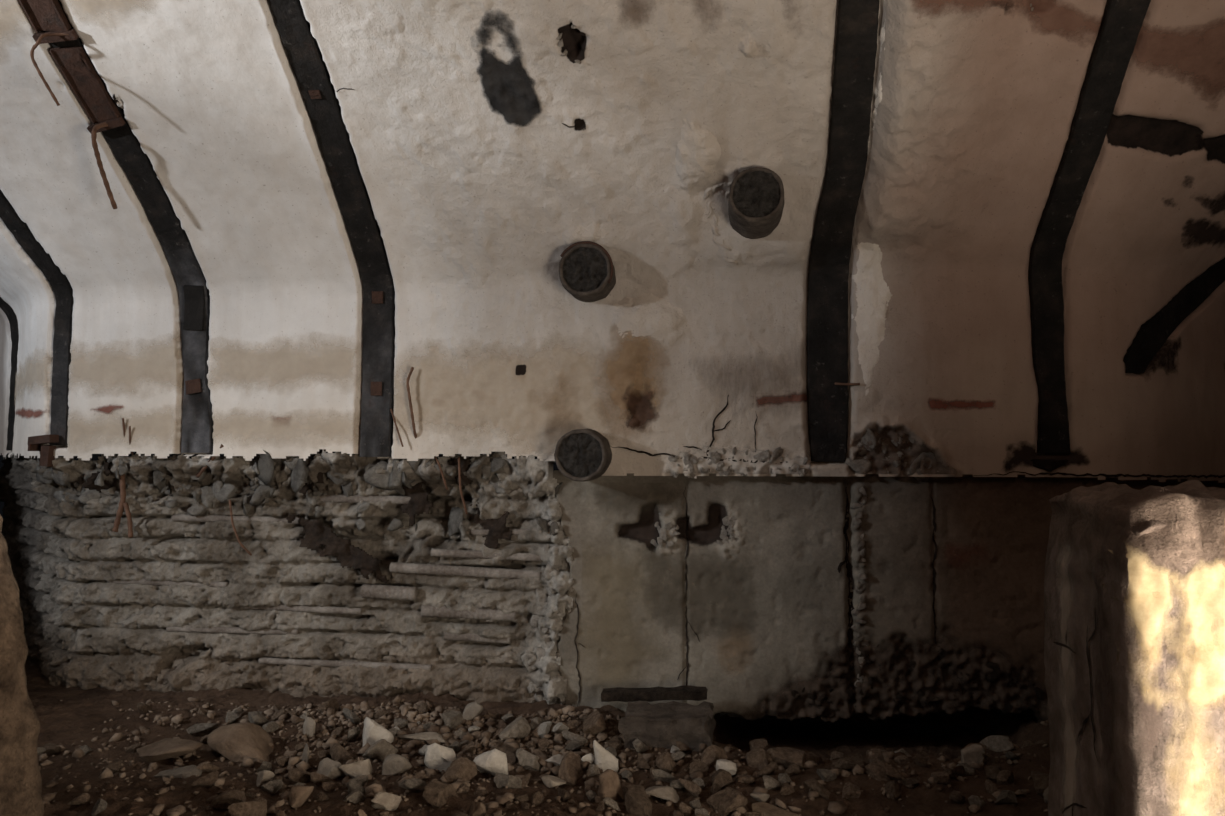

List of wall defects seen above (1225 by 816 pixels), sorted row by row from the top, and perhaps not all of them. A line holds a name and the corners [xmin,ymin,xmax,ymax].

damp [477,13,522,71]
spalling [557,22,587,64]
spalling [844,427,956,482]
spalling [618,503,738,551]
crack [612,395,788,686]
spalling [0,449,575,706]
spalling [743,635,1048,723]